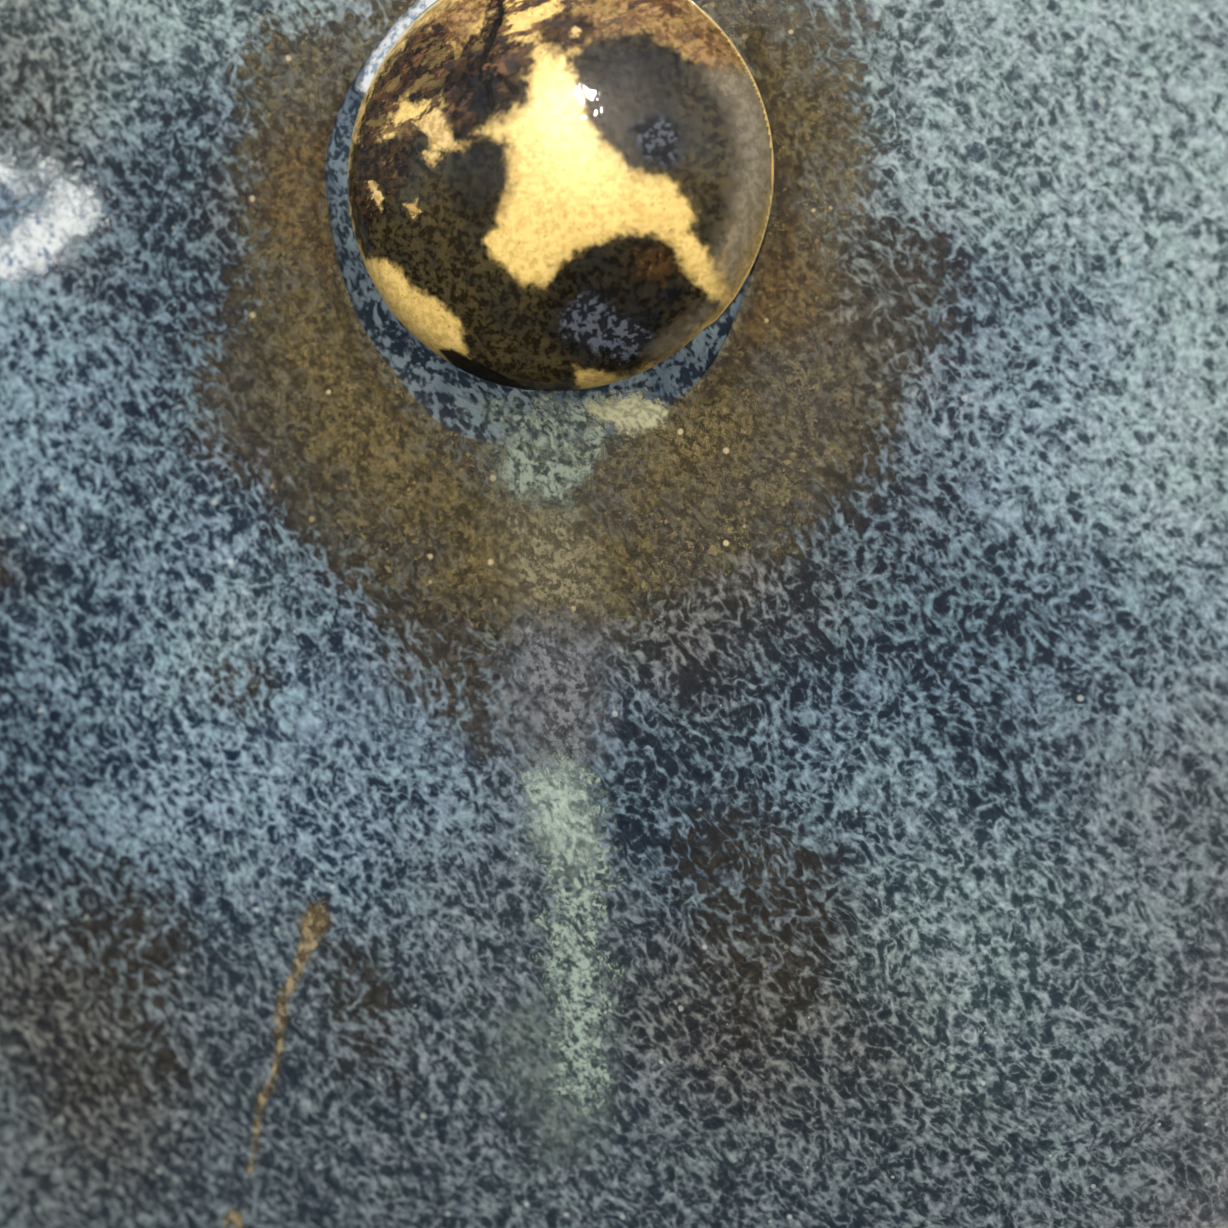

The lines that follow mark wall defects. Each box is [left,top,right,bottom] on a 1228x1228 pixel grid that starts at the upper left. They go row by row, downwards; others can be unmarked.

leakage [0,146,101,229]
corrosion [192,0,952,757]
leakage [482,390,668,1145]